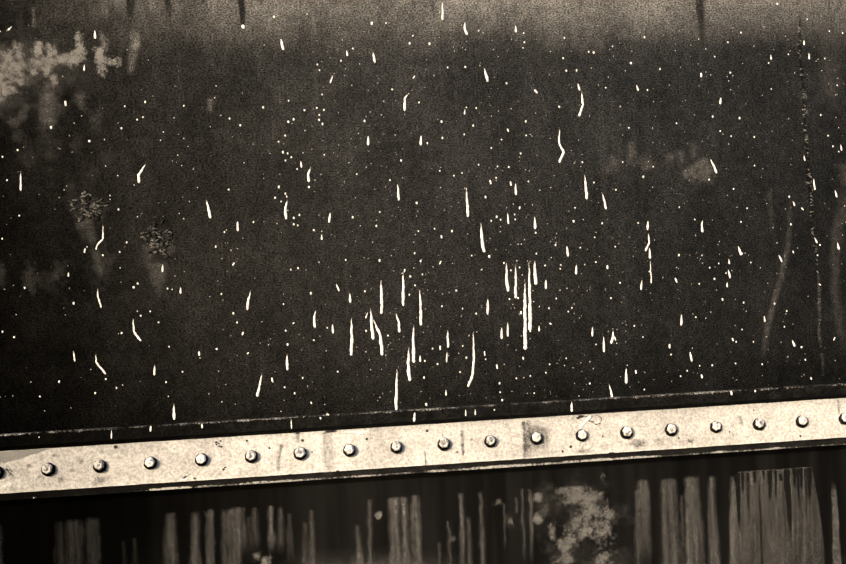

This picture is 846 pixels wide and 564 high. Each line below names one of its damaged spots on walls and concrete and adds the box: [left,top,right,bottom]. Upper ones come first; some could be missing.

water stain [389,497,420,564]
water stain [730,467,812,561]
water stain [832,491,841,564]